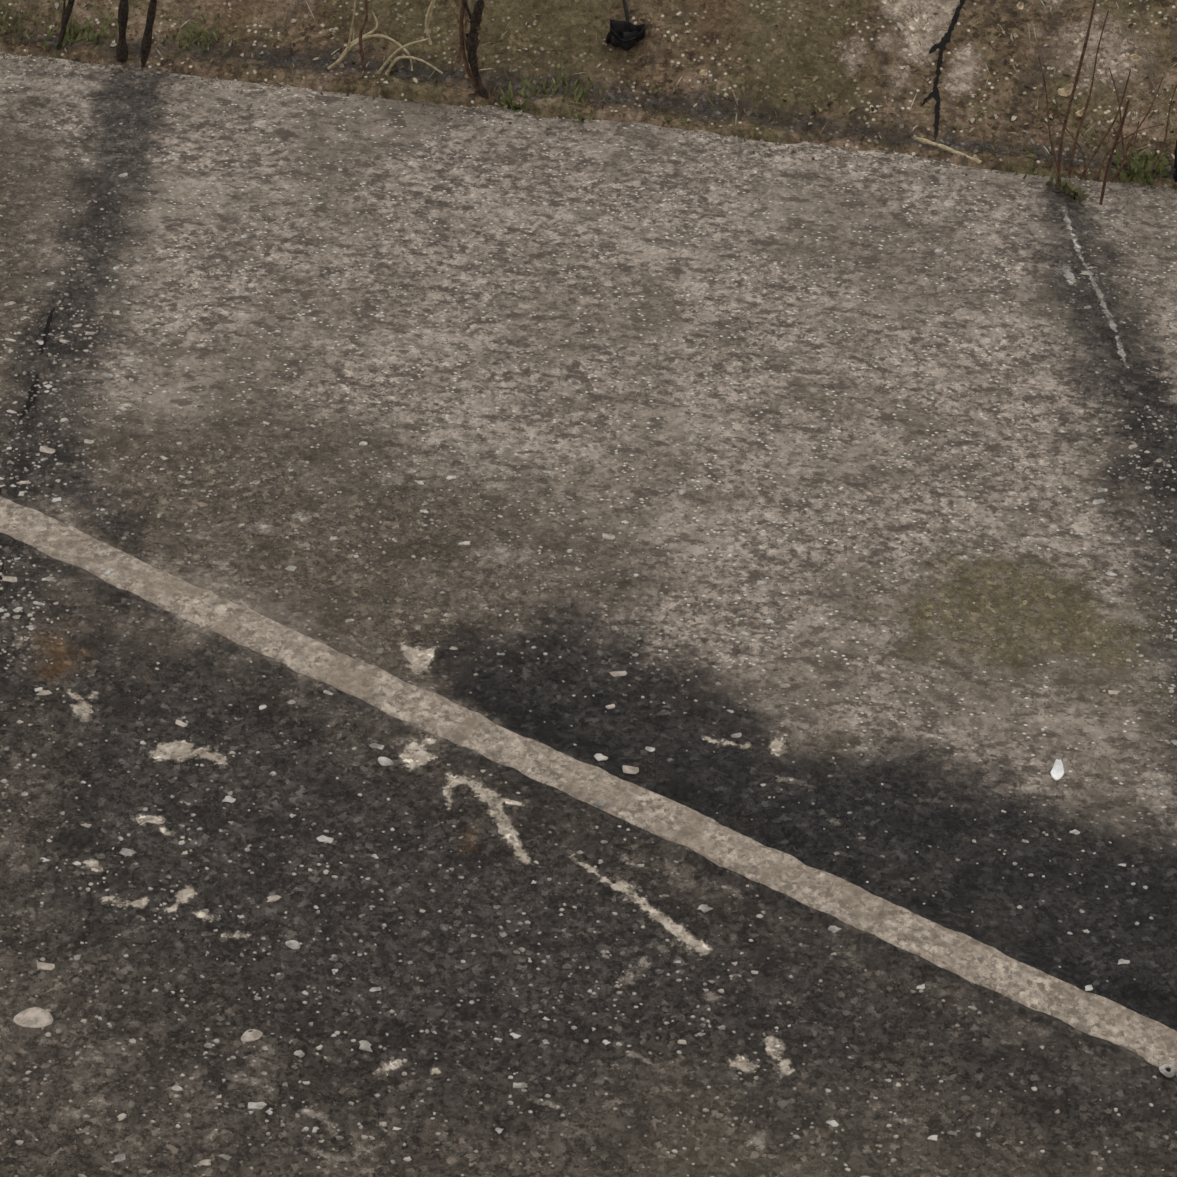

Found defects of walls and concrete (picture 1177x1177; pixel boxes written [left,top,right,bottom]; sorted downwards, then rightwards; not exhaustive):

crack [19,307,55,420]